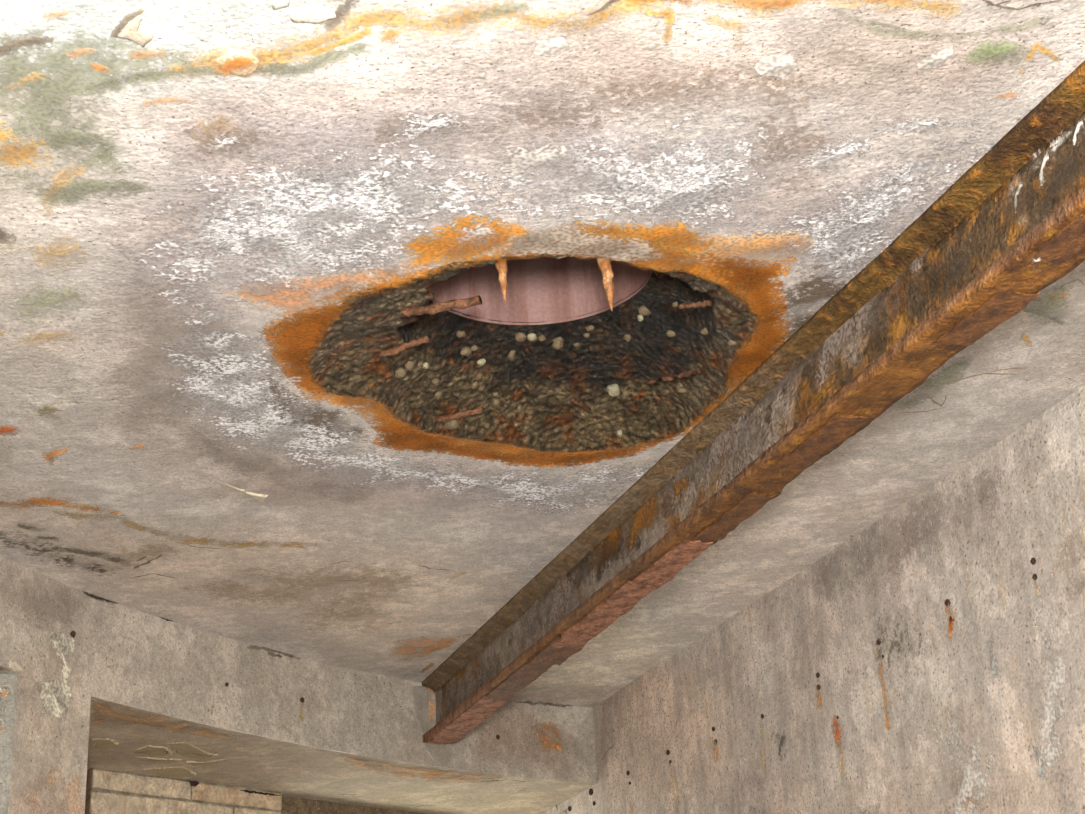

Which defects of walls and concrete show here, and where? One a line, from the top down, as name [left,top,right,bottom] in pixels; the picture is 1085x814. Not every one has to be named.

leakage [0,37,51,56]
corrosion [252,0,691,68]
corrosion [719,0,805,10]
corrosion [863,0,953,13]
crack [984,0,1061,10]
corrosion [1025,43,1059,61]
leakage [15,110,150,206]
leakage [762,117,993,339]
leakage [138,113,773,514]
corrosion [232,215,807,467]
spalling [305,224,761,452]
corrosion [832,717,841,745]